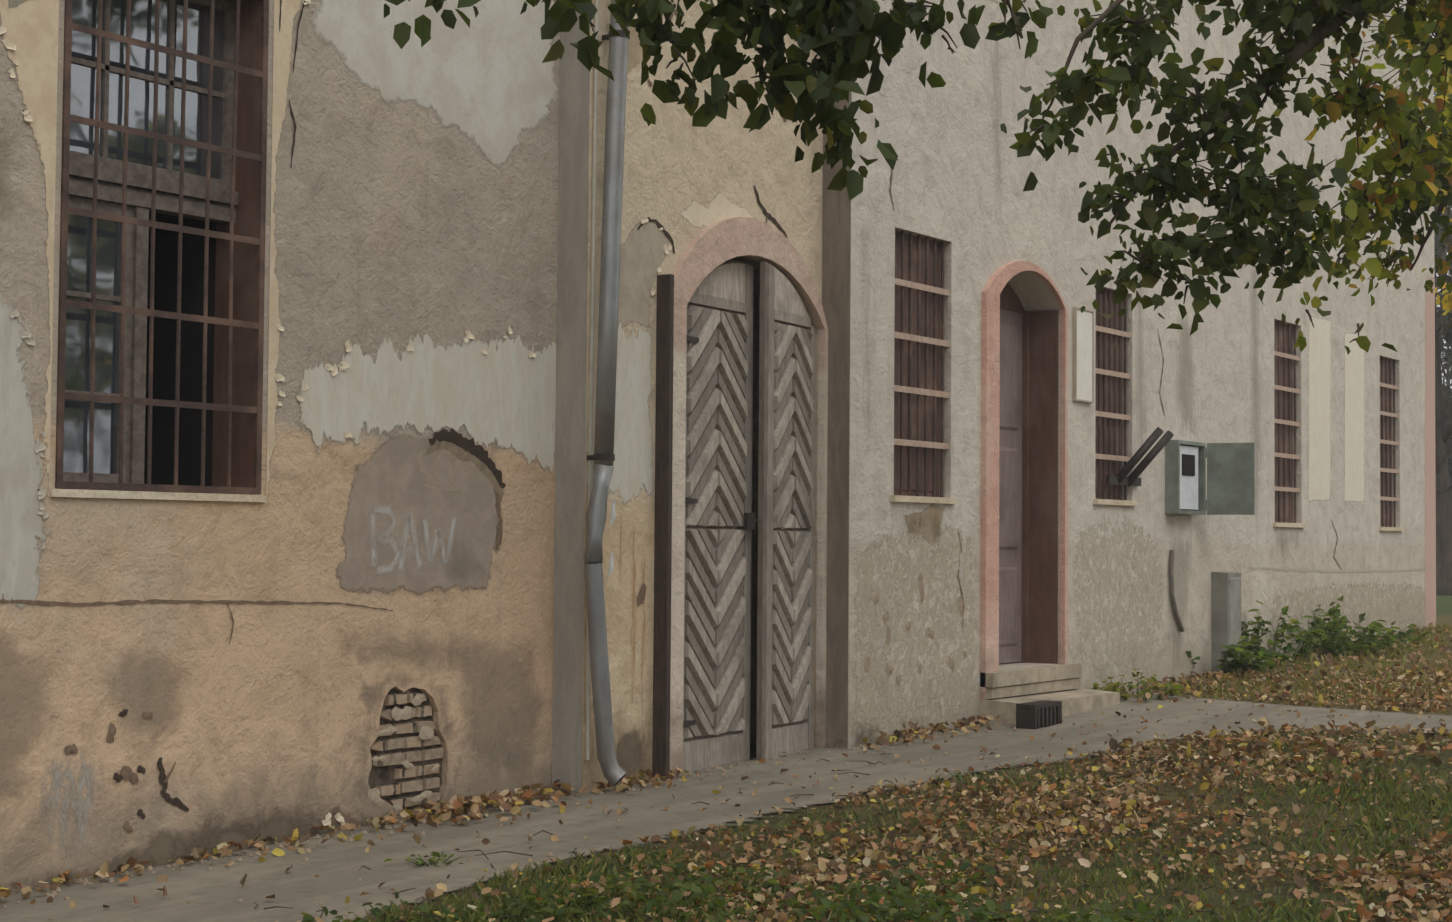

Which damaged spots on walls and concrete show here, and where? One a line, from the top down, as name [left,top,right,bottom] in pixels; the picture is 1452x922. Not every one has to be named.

peeling [627,26,642,74]
peeling [680,193,753,228]
crack [754,185,787,237]
peeling [266,0,559,498]
peeling [0,0,59,609]
crack [0,599,393,644]
spalling [106,709,153,743]
spalling [64,744,78,755]
spalling [363,688,444,812]
spalling [113,765,146,785]
spalling [123,809,146,833]